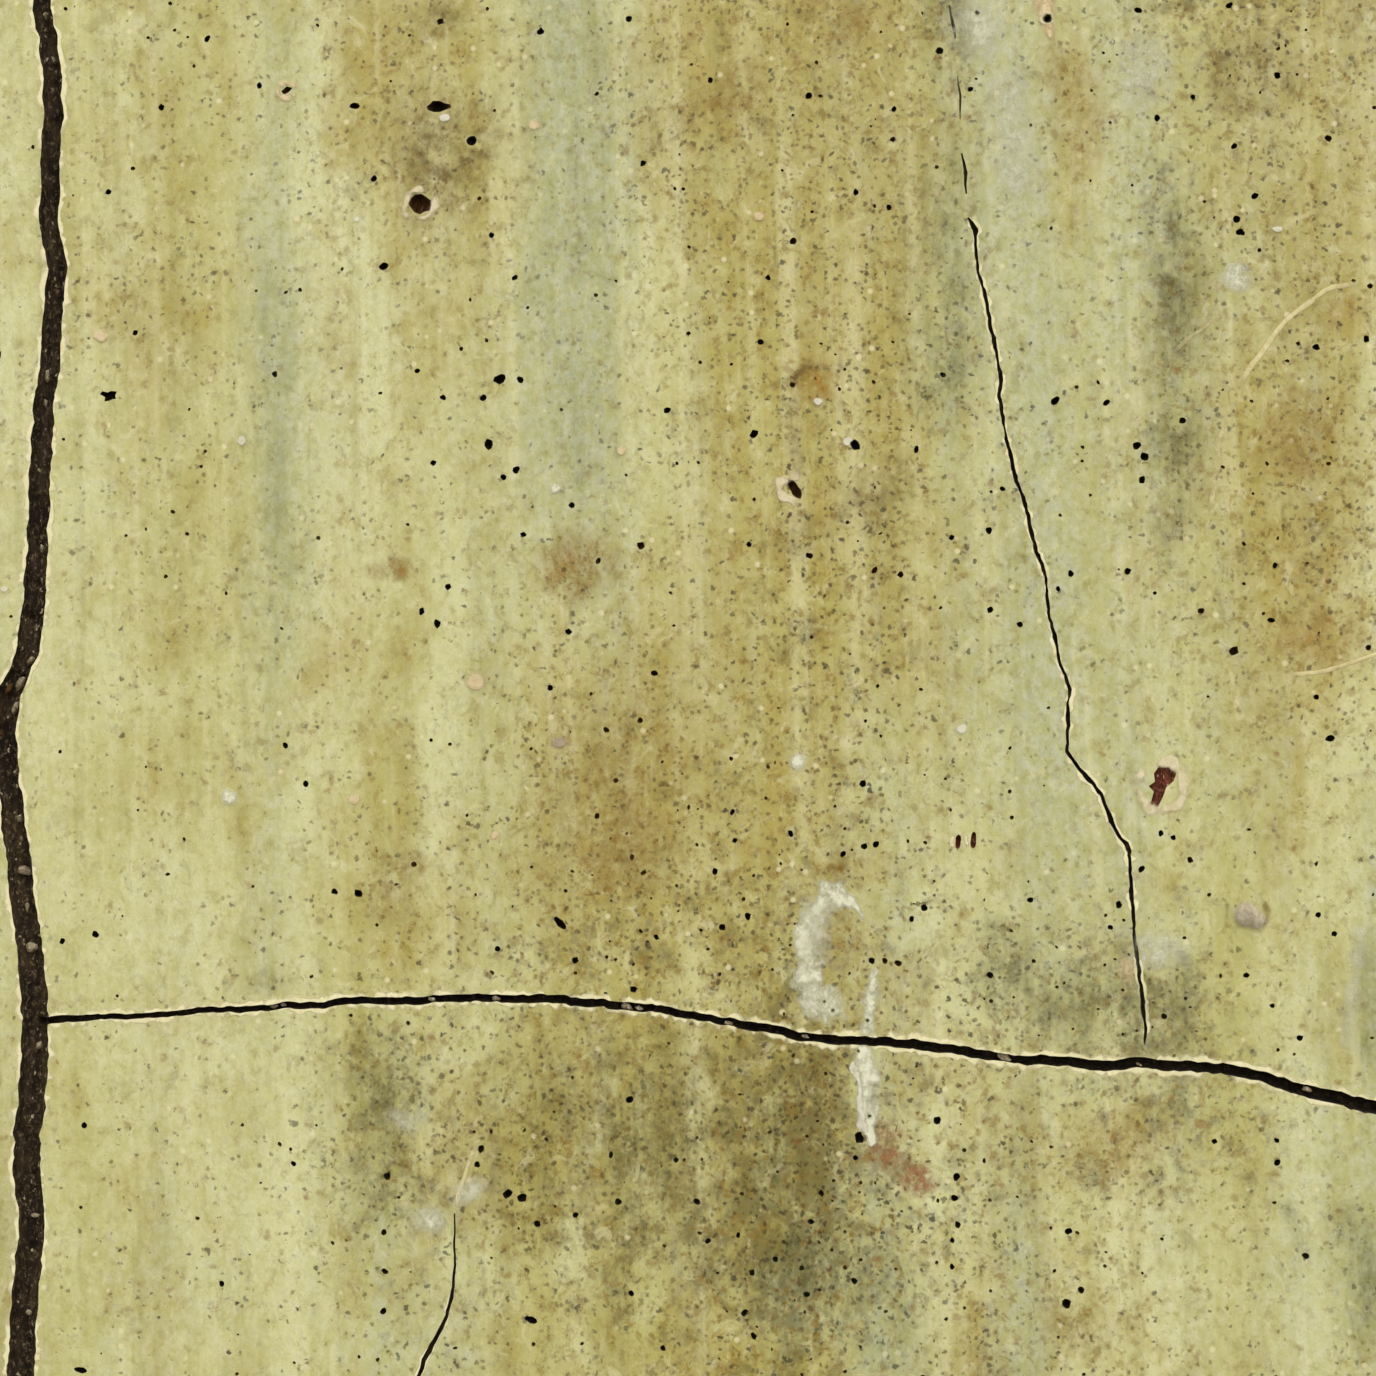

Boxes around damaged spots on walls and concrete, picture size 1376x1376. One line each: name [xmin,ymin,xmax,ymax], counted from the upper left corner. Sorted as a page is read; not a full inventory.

crack [948,5,956,39]
crack [955,76,963,119]
crack [960,153,968,194]
crack [1242,283,1350,379]
crack [1210,428,1225,503]
crack [0,0,71,1376]
crack [967,217,1151,1045]
crack [1294,652,1376,676]
damp [792,881,864,1023]
crack [38,989,1376,1114]
damp [849,968,880,1146]
crack [414,1150,475,1376]